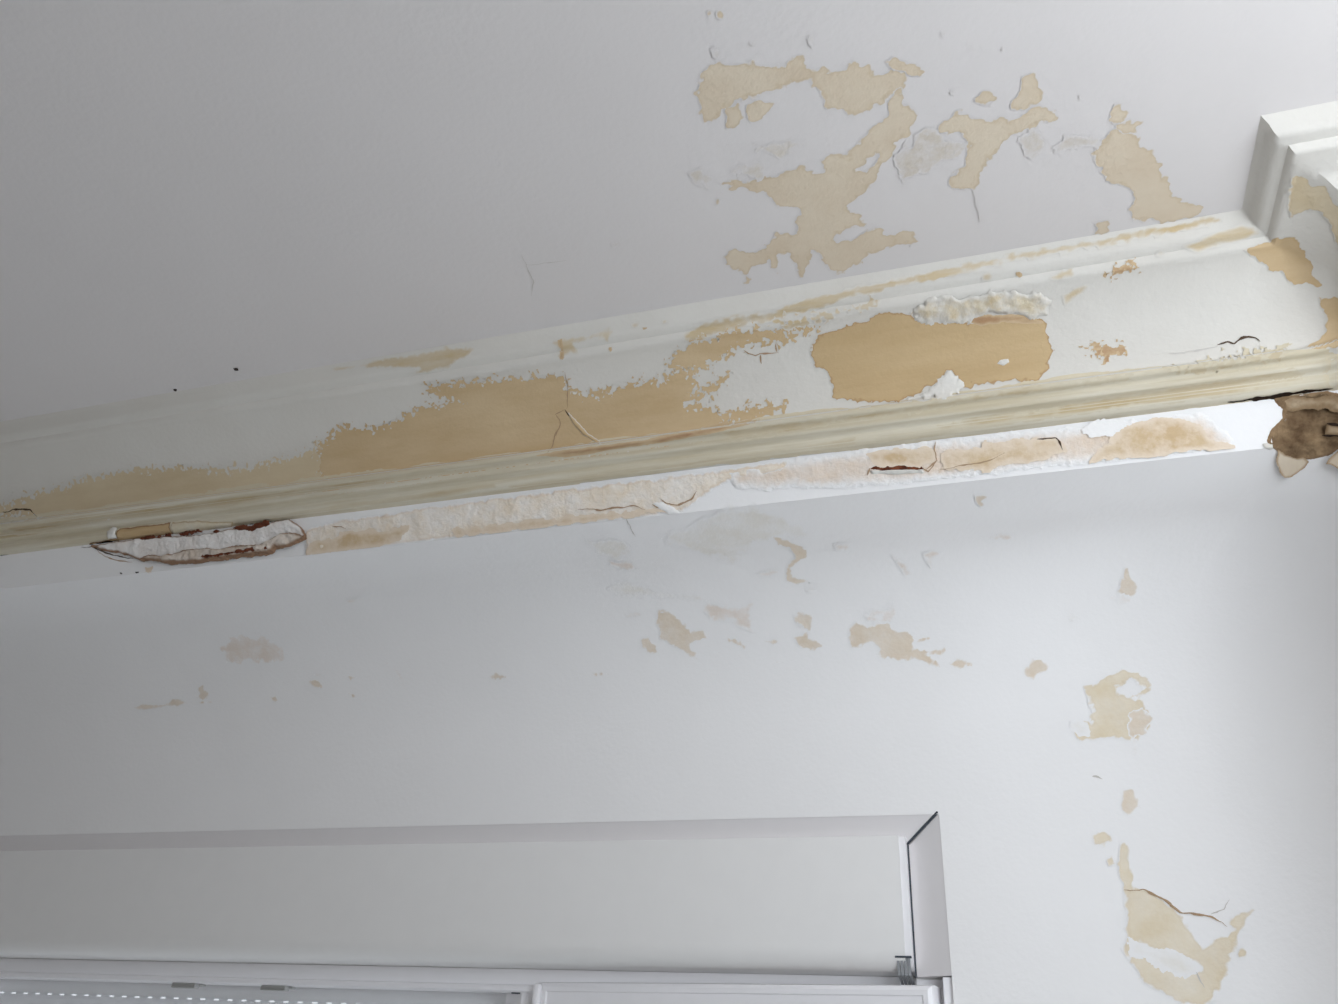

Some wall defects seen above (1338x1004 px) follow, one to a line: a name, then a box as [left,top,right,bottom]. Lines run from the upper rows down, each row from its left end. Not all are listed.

peeling [687,34,1205,284]
peeling [1286,176,1338,246]
peeling [1243,236,1323,288]
peeling [309,365,740,499]
damp [0,215,1338,565]
peeling [810,311,1055,404]
spalling [1262,391,1338,478]
peeling [624,602,823,660]
peeling [848,604,973,671]